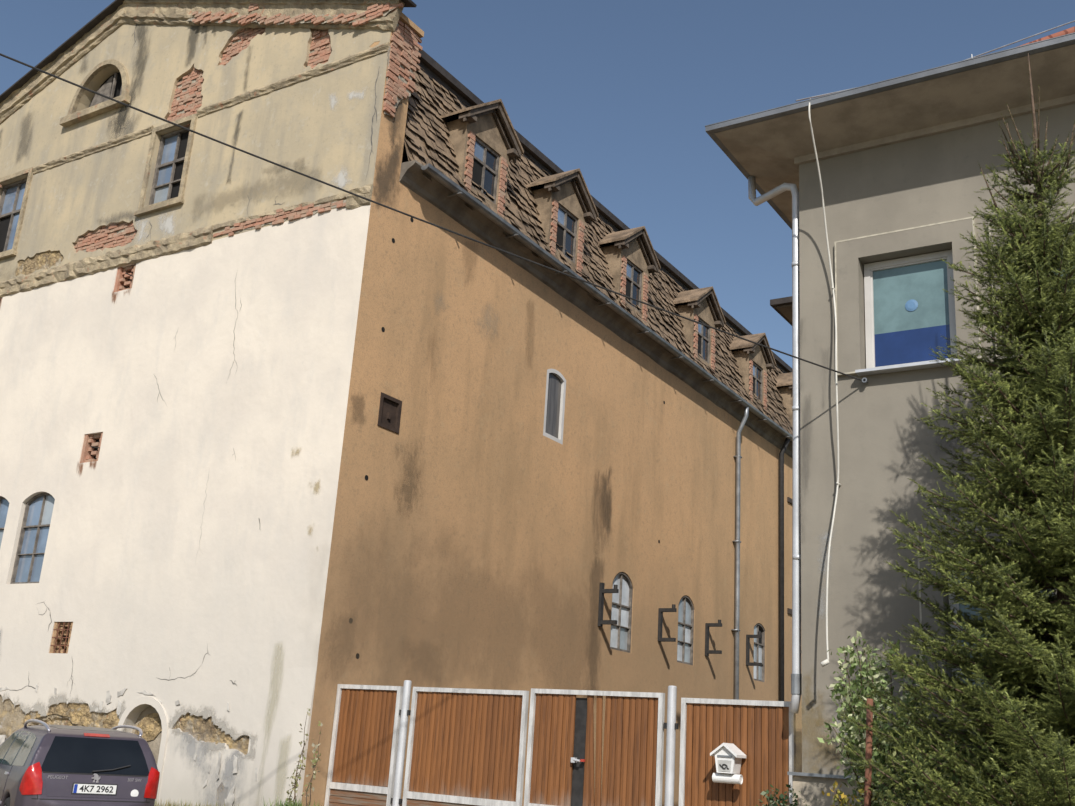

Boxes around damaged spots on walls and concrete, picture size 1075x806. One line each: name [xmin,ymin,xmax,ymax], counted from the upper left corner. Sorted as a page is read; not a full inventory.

flaking render [187,2,422,118]
flaking render [167,67,204,127]
flaking render [16,251,64,276]
flaking render [74,222,138,253]
flaking render [213,199,347,237]
flaking render [0,684,258,806]